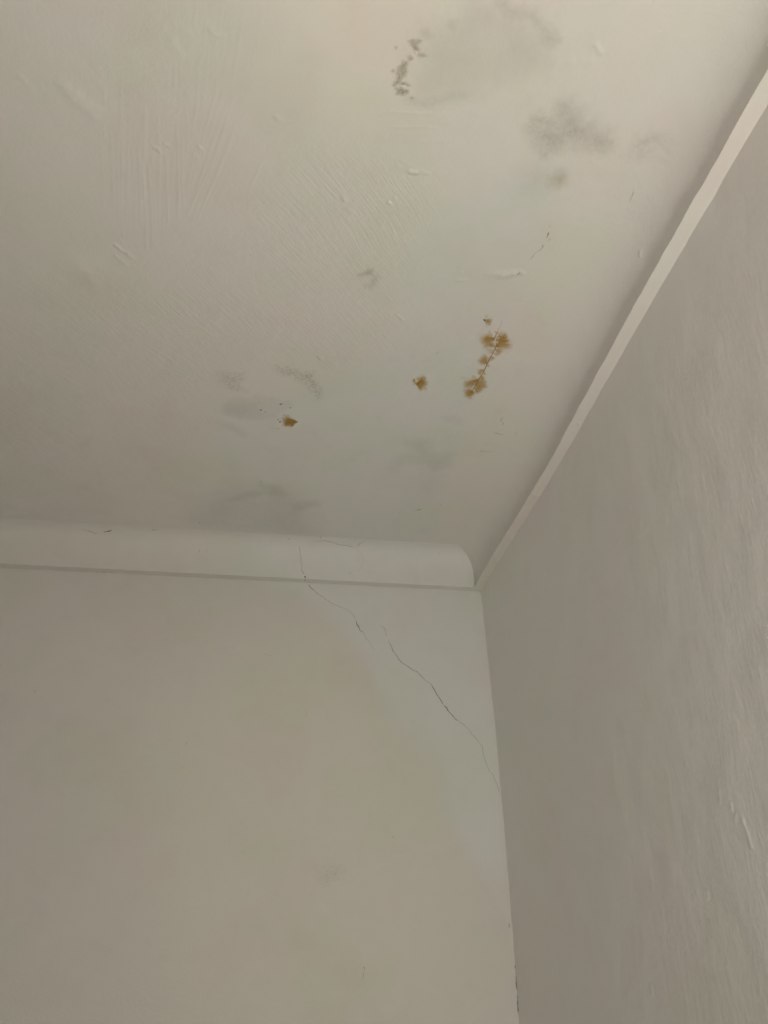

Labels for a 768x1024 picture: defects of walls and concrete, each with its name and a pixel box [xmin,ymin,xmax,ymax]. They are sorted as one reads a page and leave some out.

rust [467,332,507,396]